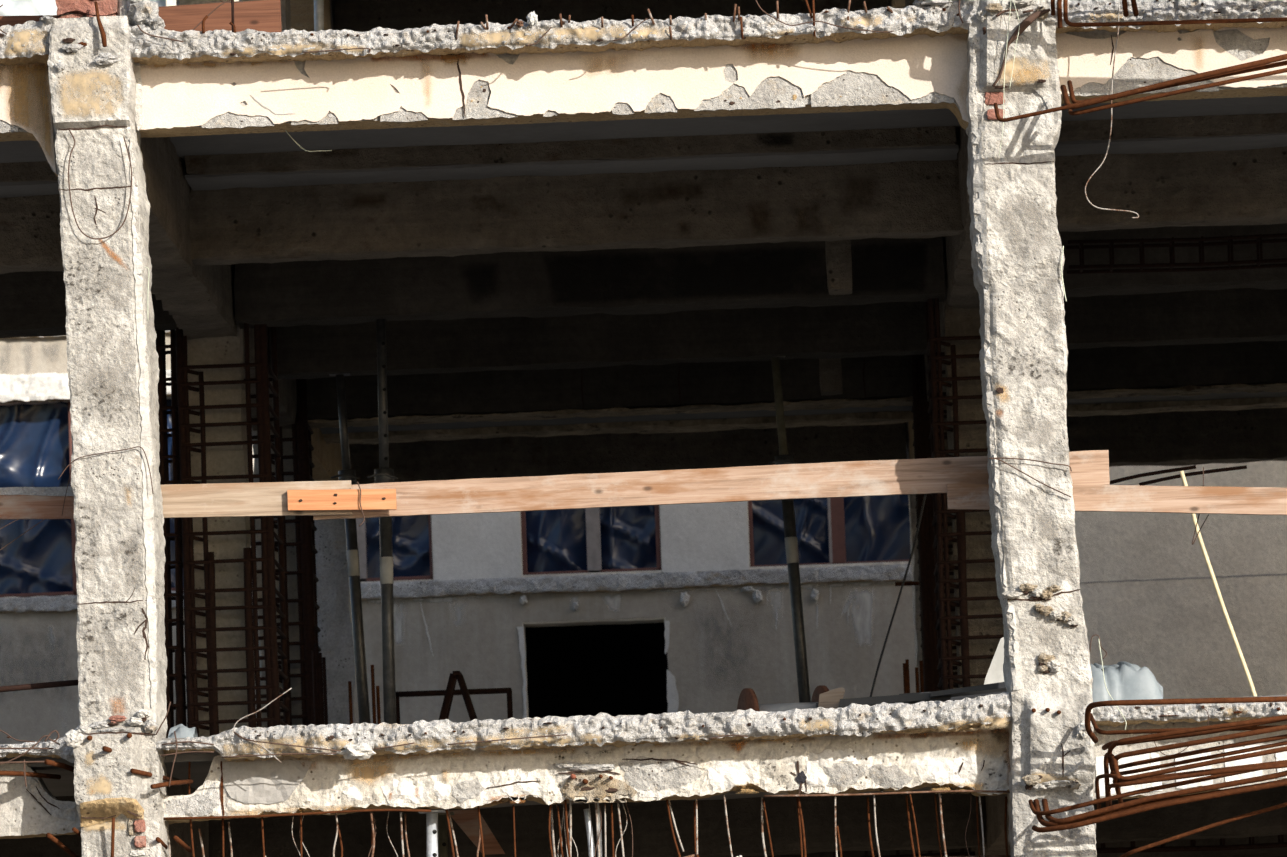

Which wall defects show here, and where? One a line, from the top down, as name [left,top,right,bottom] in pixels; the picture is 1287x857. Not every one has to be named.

flaking render [1213,29,1270,61]
flaking render [201,101,274,129]
flaking render [291,111,339,125]
flaking render [380,85,428,122]
flaking render [452,80,518,120]
flaking render [612,93,677,115]
flaking render [694,64,954,111]
crack [58,186,131,227]
spalling [163,627,1081,857]